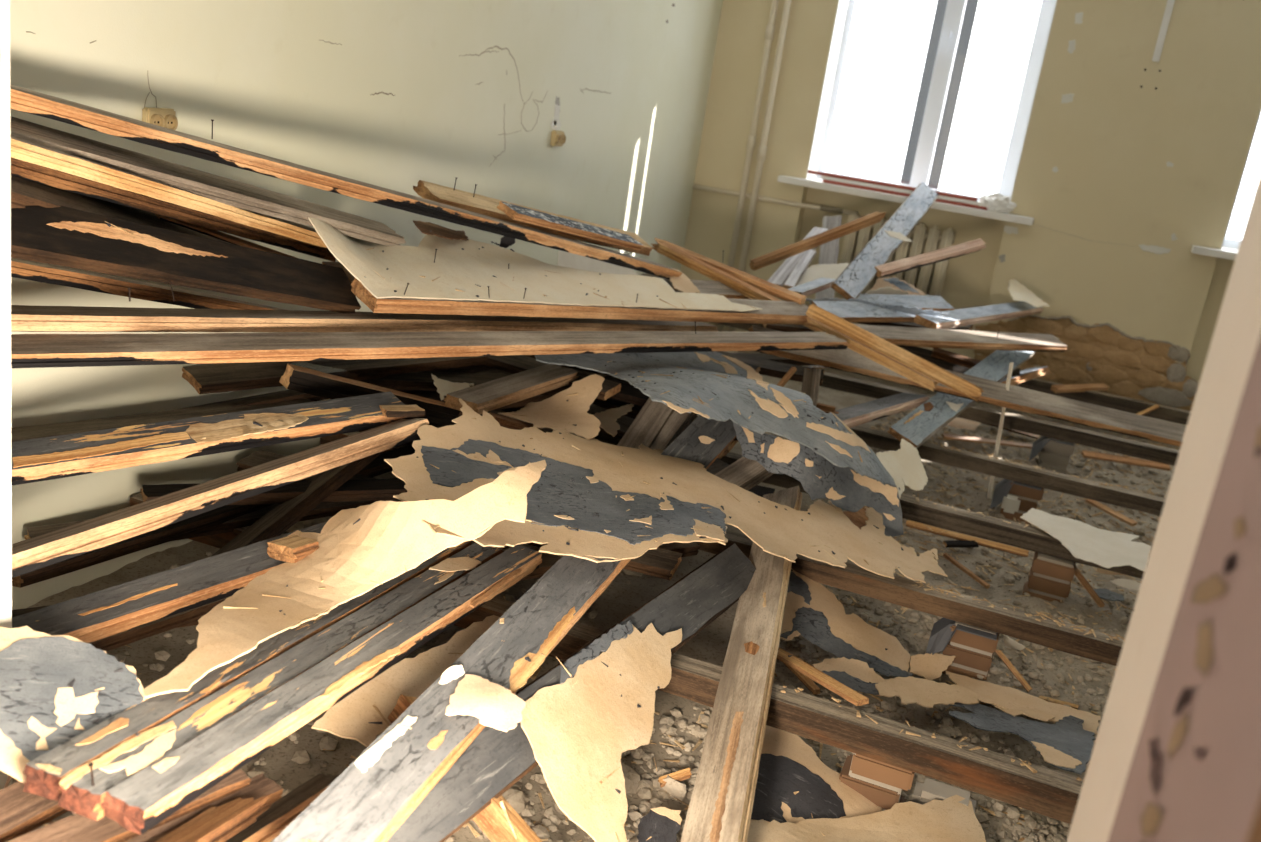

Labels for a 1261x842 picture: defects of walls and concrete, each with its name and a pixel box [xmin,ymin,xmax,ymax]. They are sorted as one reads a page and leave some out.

crack [460,45,548,167]
flaking render [974,315,1199,411]
spalling [1193,554,1236,603]
spalling [1141,687,1205,838]